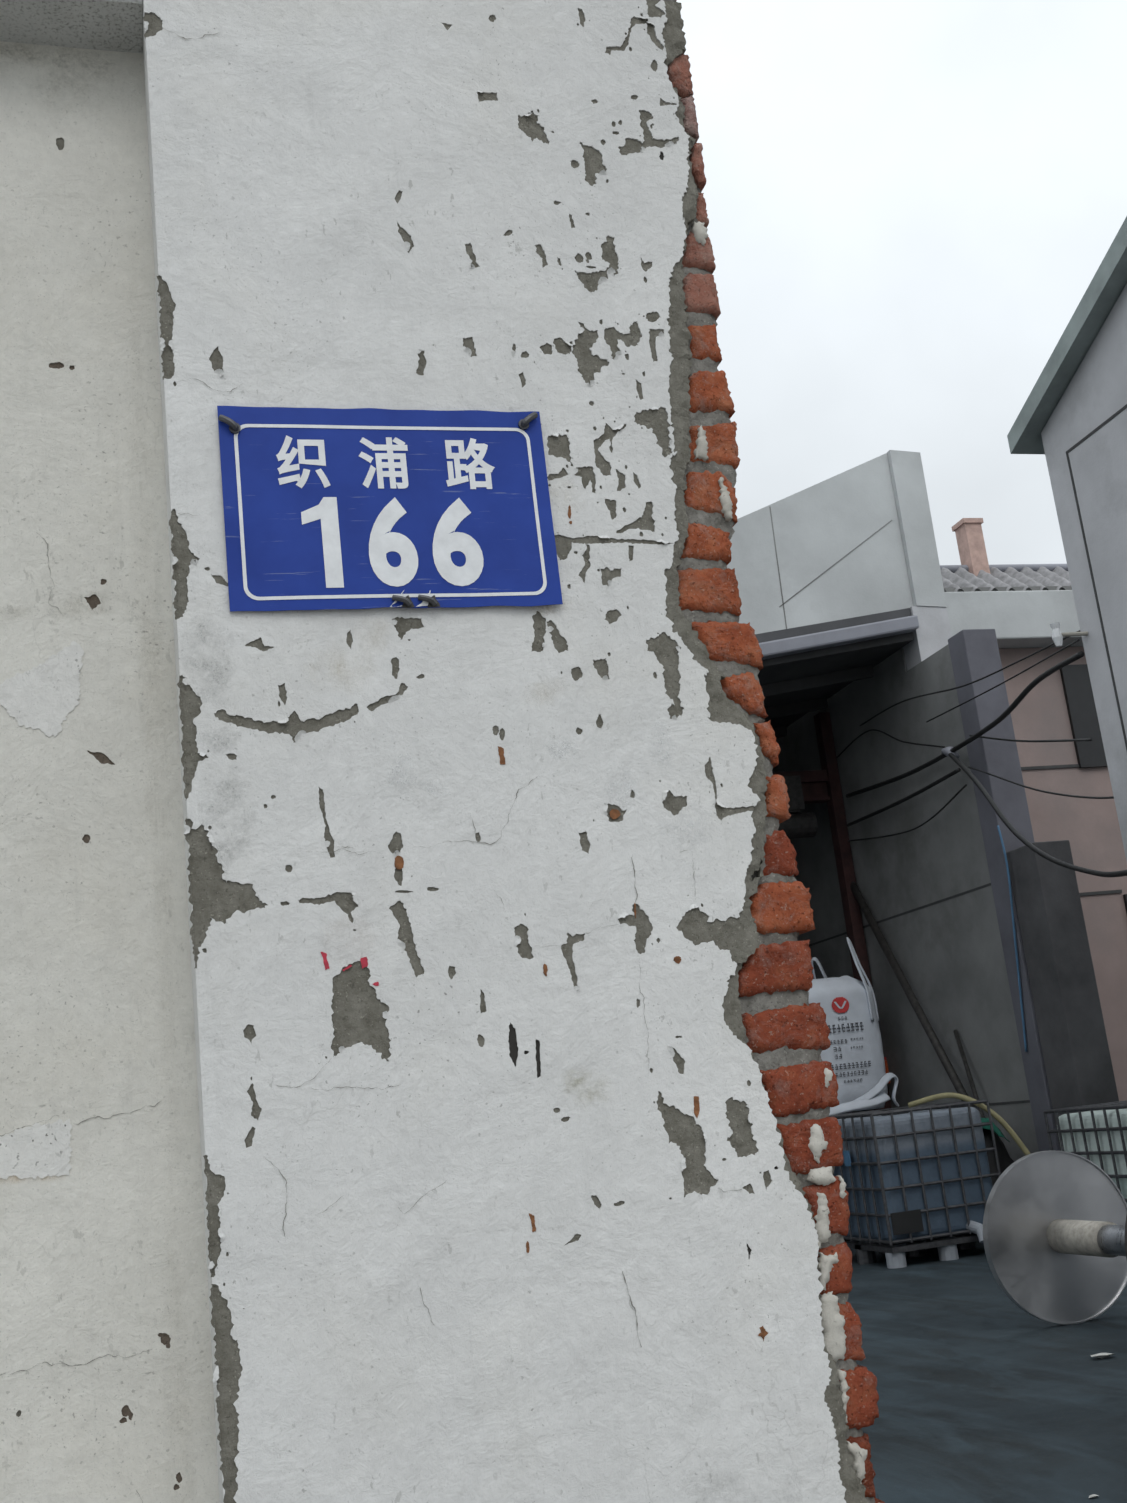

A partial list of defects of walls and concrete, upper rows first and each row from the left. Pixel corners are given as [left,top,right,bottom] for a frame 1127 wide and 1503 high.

peeling [245,638,274,651]
peeling [392,617,424,641]
peeling [177,658,424,799]
flaking render [512,0,885,1503]
peeling [319,788,335,858]
peeling [184,818,359,969]
peeling [325,961,391,1061]
peeling [158,1333,171,1348]
peeling [203,1155,245,1503]